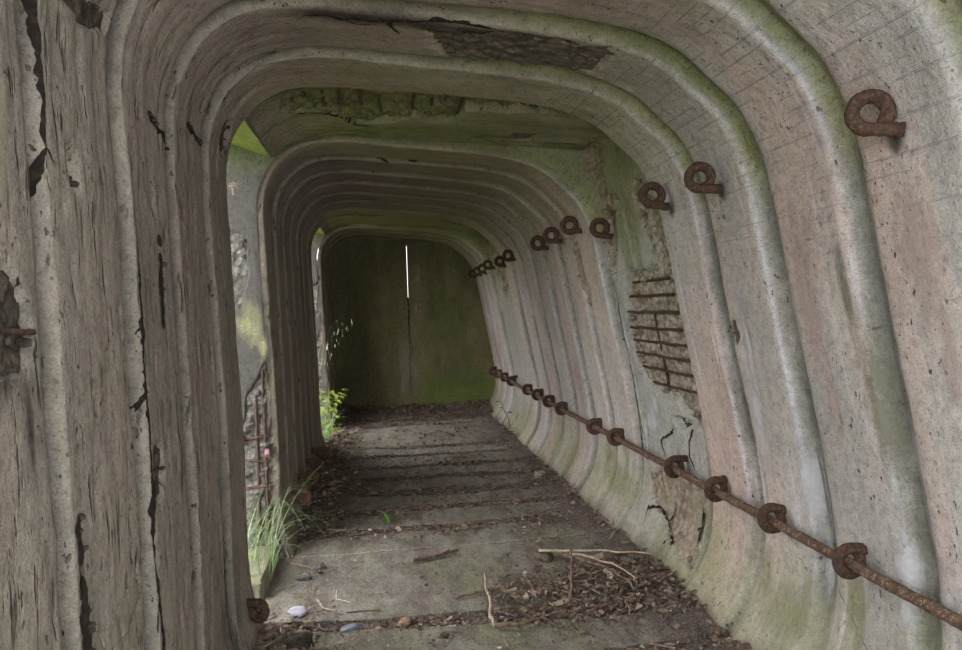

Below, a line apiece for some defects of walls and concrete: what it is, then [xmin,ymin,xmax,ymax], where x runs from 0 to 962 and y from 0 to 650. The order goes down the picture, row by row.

spalling [62,0,103,32]
spalling [427,29,614,72]
rust [890,136,901,151]
spalling [577,143,622,267]
spalling [0,270,36,376]
crack [406,297,414,396]
crack [612,272,696,471]
spalling [627,173,703,428]
crack [643,505,705,547]